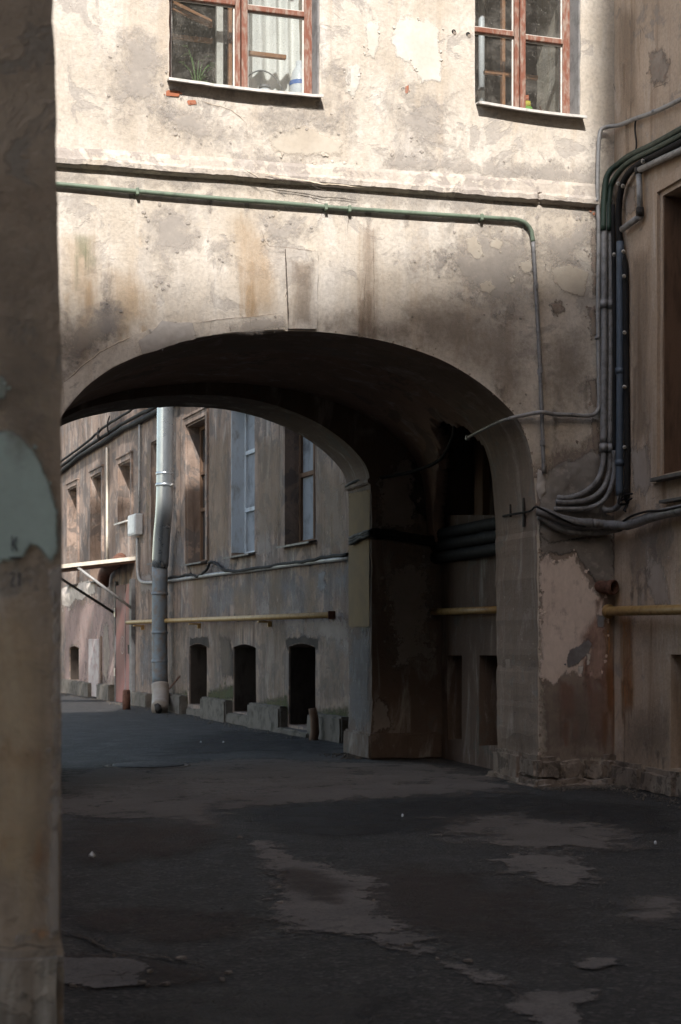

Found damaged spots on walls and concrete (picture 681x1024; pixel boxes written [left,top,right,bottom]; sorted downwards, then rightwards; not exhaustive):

peeling [238,14,471,168]
flaking render [646,49,670,87]
peeling [549,208,596,341]
flaking render [534,379,614,516]
flaking render [538,522,615,755]